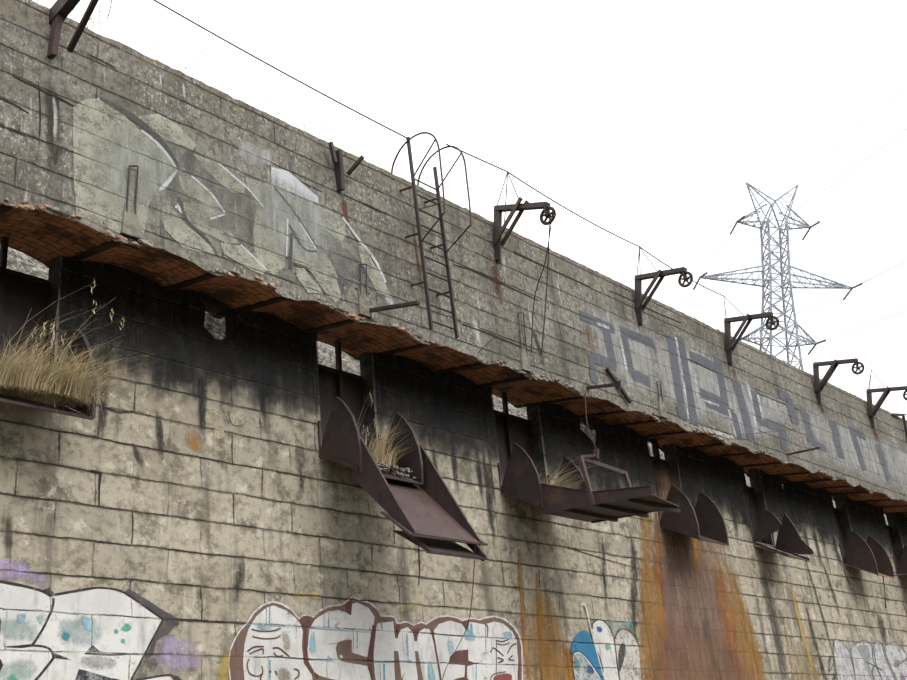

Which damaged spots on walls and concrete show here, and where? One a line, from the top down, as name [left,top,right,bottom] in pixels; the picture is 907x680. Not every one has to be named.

rust [518,562,592,680]